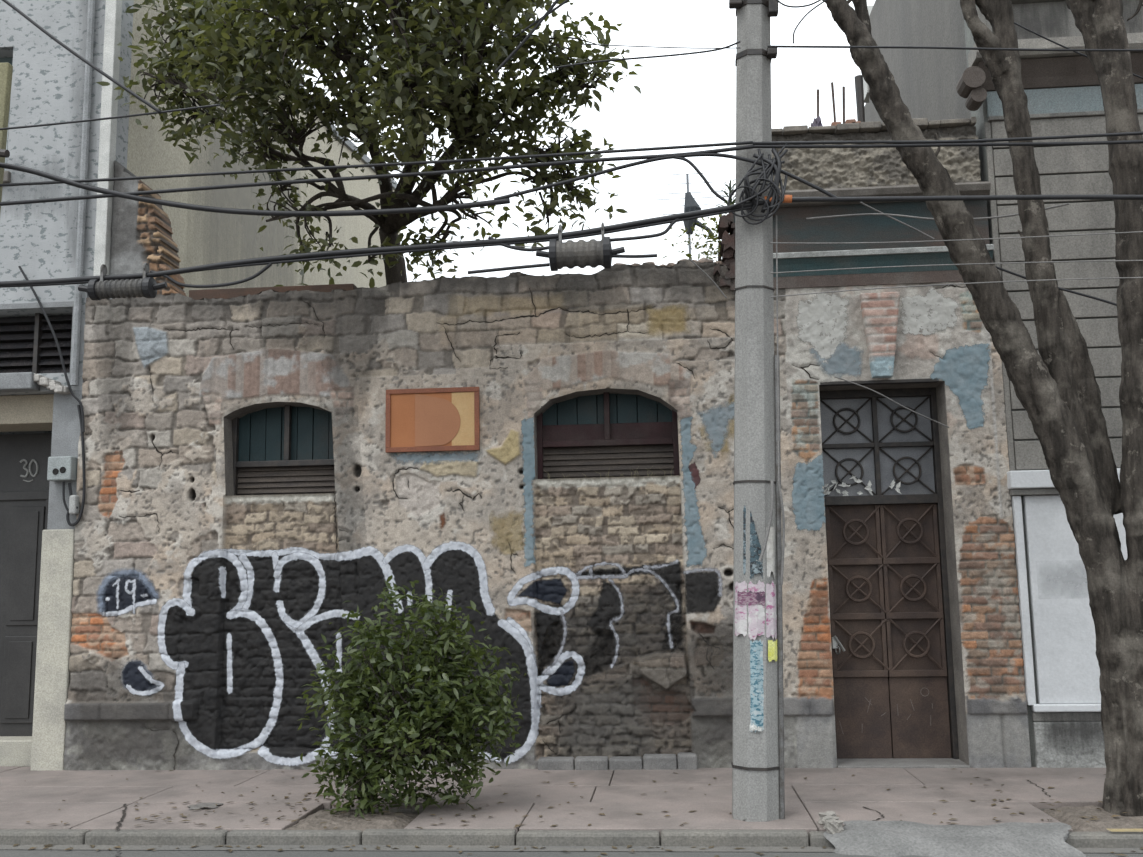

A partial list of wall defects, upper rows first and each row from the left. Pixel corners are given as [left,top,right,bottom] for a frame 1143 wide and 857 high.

crack [438,288,655,369]
peeling [900,288,991,429]
spalling [98,451,125,518]
crack [119,490,160,532]
flaking render [954,464,986,486]
spalling [71,613,128,661]
flaking render [797,578,834,700]
flaking render [958,511,1026,701]